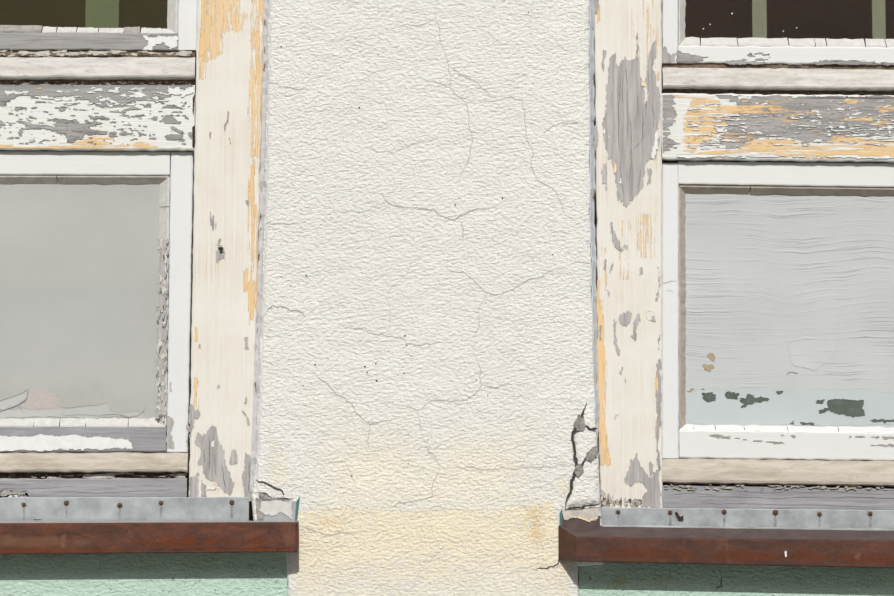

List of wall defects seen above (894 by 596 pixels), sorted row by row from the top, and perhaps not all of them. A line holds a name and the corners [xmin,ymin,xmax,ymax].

peeling [0,0,264,325]
crack [327,197,493,238]
crack [408,5,594,217]
peeling [594,0,894,208]
peeling [0,434,133,452]
peeling [0,237,174,449]
peeling [159,376,293,520]
crack [252,443,293,500]
crack [254,294,305,394]
crack [310,250,601,596]
peeling [575,213,661,477]
peeling [686,388,894,444]